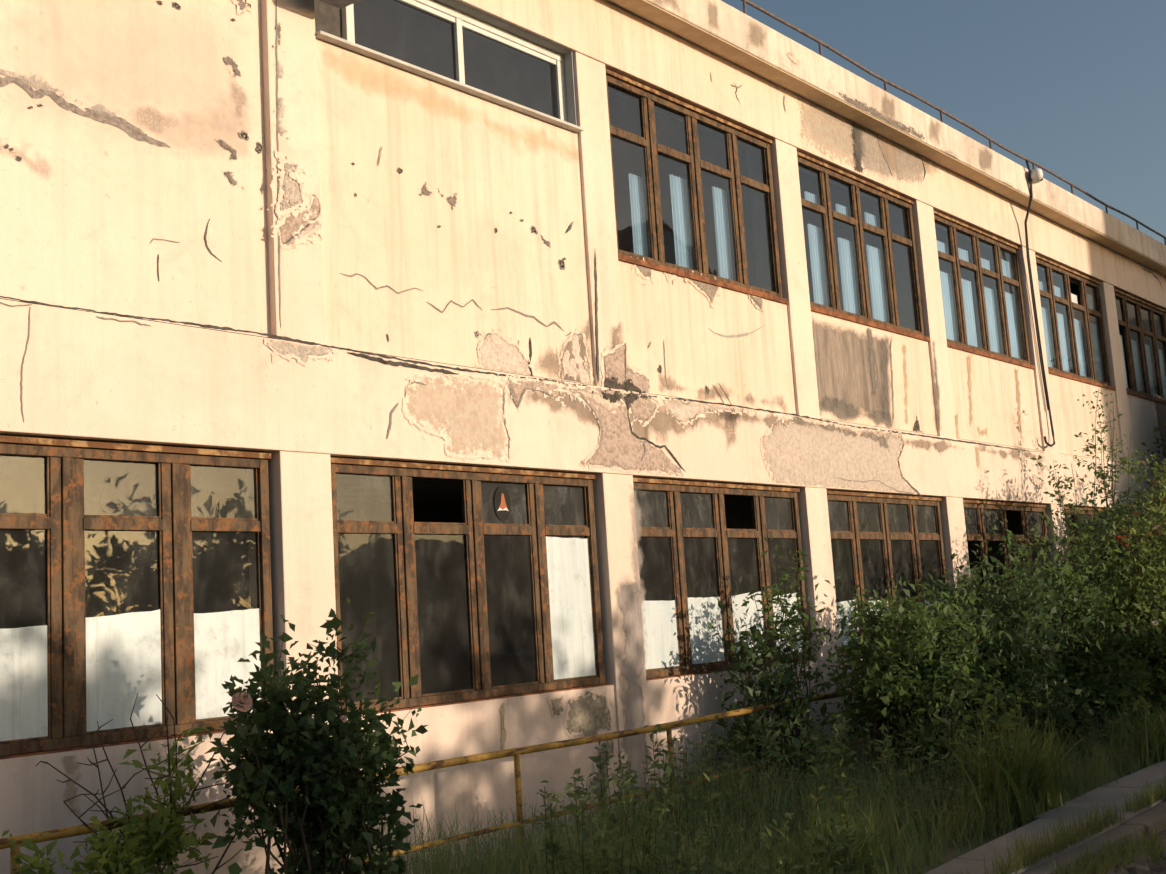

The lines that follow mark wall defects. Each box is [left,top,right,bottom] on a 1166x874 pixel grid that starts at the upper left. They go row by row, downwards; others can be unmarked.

spalling [0,69,171,148]
peeling [222,57,245,103]
spalling [214,97,328,250]
crack [0,0,1044,453]
damp [542,322,591,374]
damp [532,392,606,447]
flaking render [387,249,755,476]
damp [612,328,620,355]
damp [628,320,951,455]
peeling [760,415,921,495]
damp [982,446,1036,459]
flaking render [545,690,617,803]